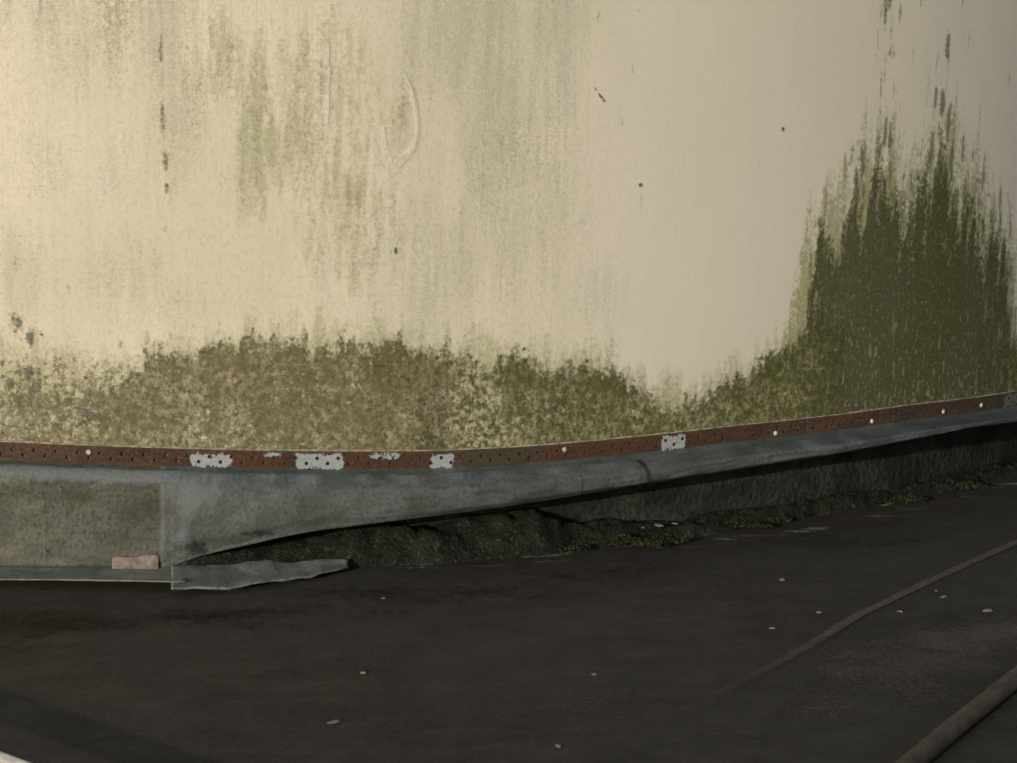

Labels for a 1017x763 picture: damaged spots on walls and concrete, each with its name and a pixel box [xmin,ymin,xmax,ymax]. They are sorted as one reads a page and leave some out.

leakage [841,87,1011,248]
leakage [11,312,42,345]
rust [229,451,290,469]
rust [343,453,444,468]